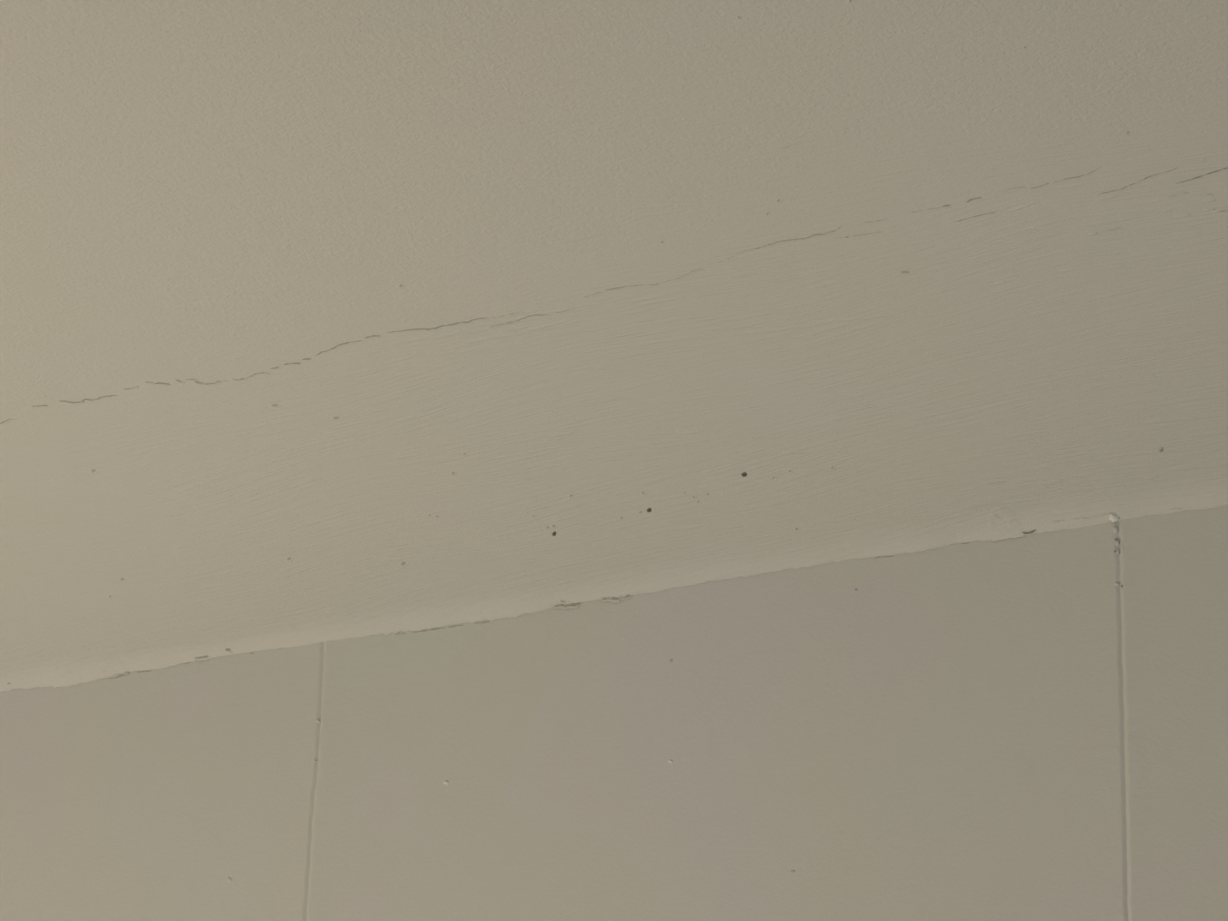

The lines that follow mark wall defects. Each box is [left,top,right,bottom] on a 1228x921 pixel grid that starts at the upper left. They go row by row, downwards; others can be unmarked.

crack [0,165,1228,426]